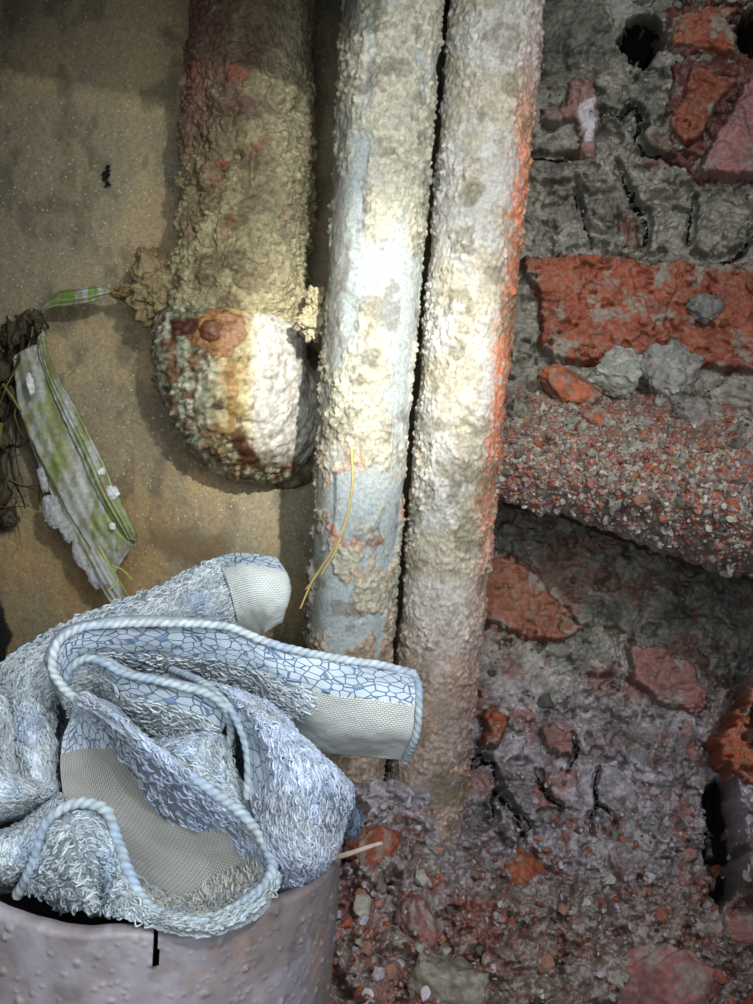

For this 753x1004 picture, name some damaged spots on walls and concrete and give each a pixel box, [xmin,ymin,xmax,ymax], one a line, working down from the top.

spalling [657,0,753,187]
crack [533,156,567,164]
crack [599,103,661,160]
crack [575,196,591,246]
crack [618,170,649,252]
crack [686,202,753,265]
corrosion [170,309,264,470]
spalling [624,644,708,715]
spalling [703,673,753,788]